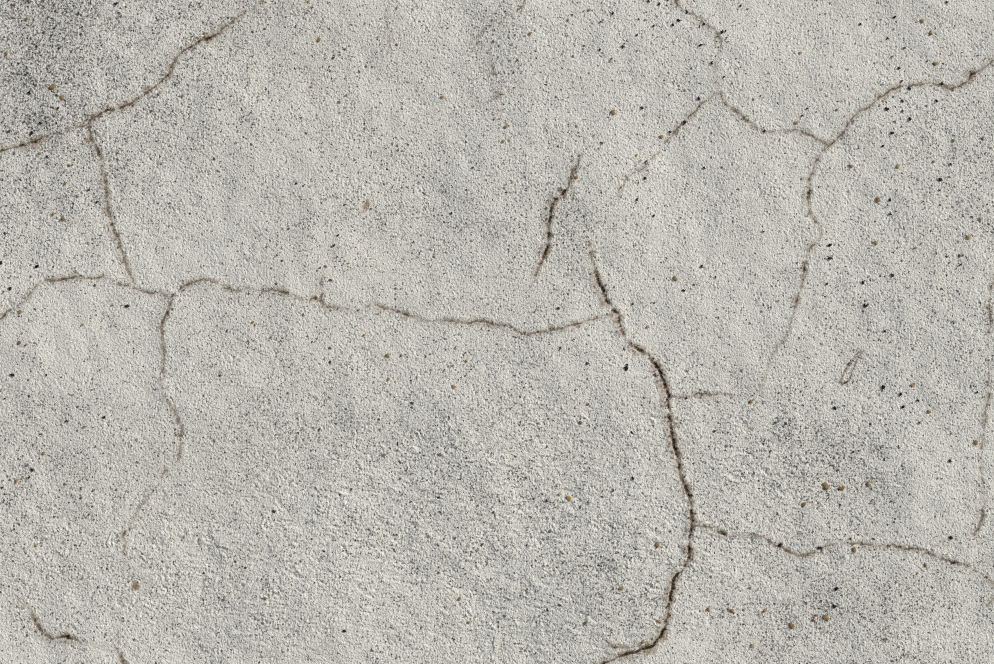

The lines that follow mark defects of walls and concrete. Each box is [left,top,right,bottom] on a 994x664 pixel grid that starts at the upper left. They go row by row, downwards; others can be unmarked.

crack [0,18,236,373]
crack [535,160,579,276]
crack [667,61,992,324]
crack [261,282,337,310]
crack [840,351,861,385]
crack [444,251,823,664]
crack [31,614,78,642]
crack [849,542,991,603]